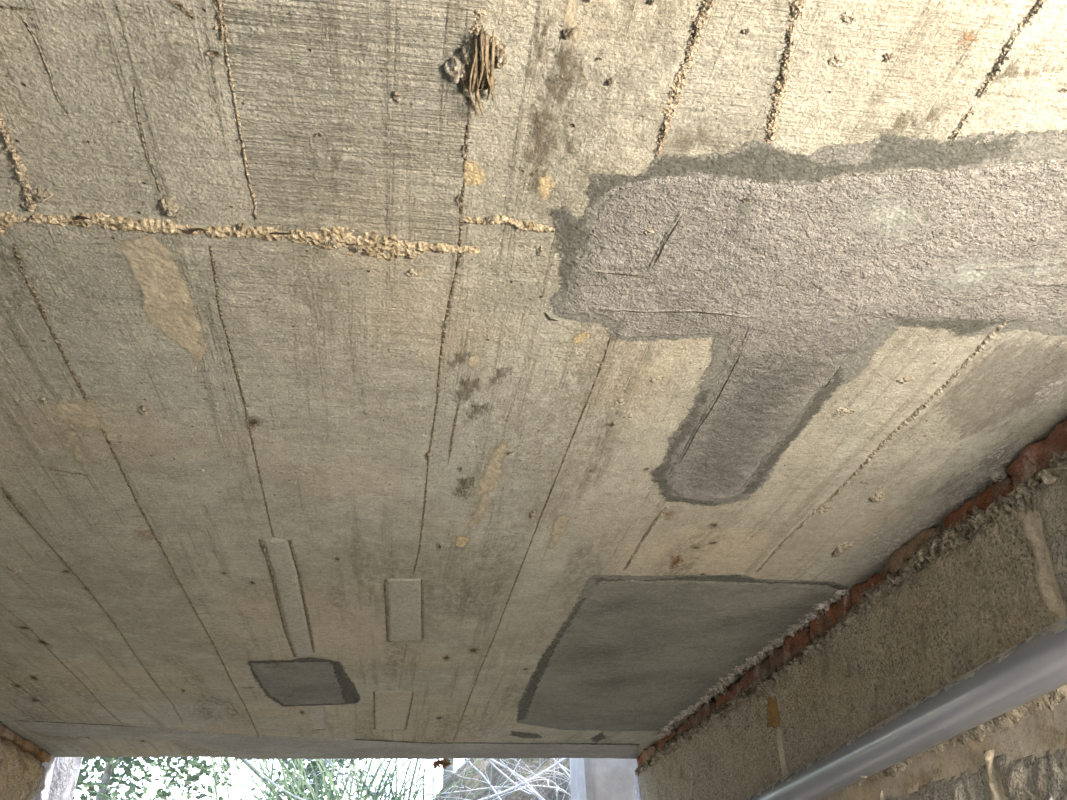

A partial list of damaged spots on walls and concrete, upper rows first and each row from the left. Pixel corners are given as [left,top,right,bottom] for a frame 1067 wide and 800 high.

crack [596,211,685,276]
crack [590,309,752,475]
spalling [670,523,719,568]